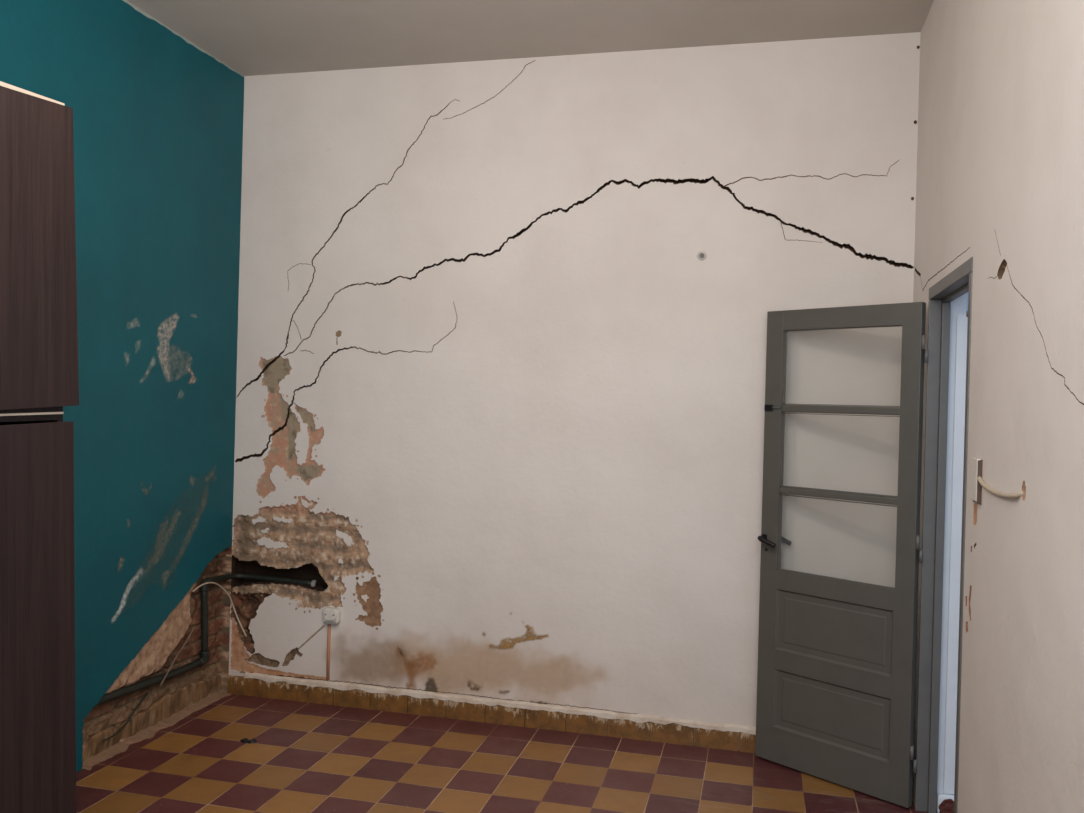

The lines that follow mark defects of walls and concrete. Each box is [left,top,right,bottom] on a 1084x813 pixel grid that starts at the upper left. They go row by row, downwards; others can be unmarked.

peeling [142,315,195,382]
crack [235,60,970,463]
crack [989,232,1084,405]
spalling [83,356,384,745]
damp [483,626,548,649]